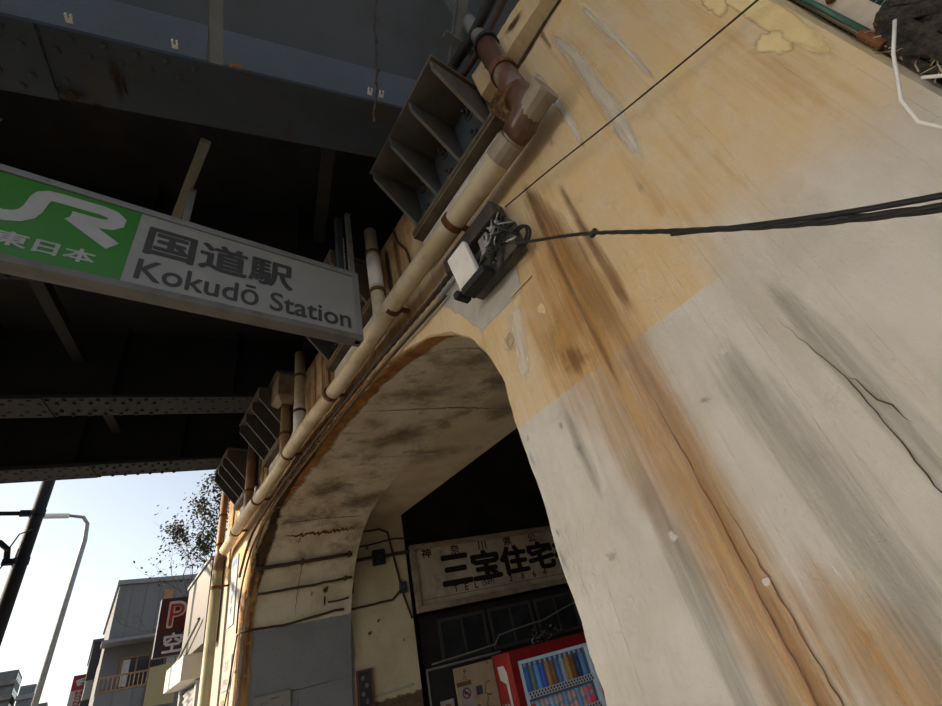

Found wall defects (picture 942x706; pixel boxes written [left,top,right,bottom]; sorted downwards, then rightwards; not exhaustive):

rust [234,336,455,706]
rust [527,192,834,706]
crack [616,334,844,706]
crack [780,322,942,493]